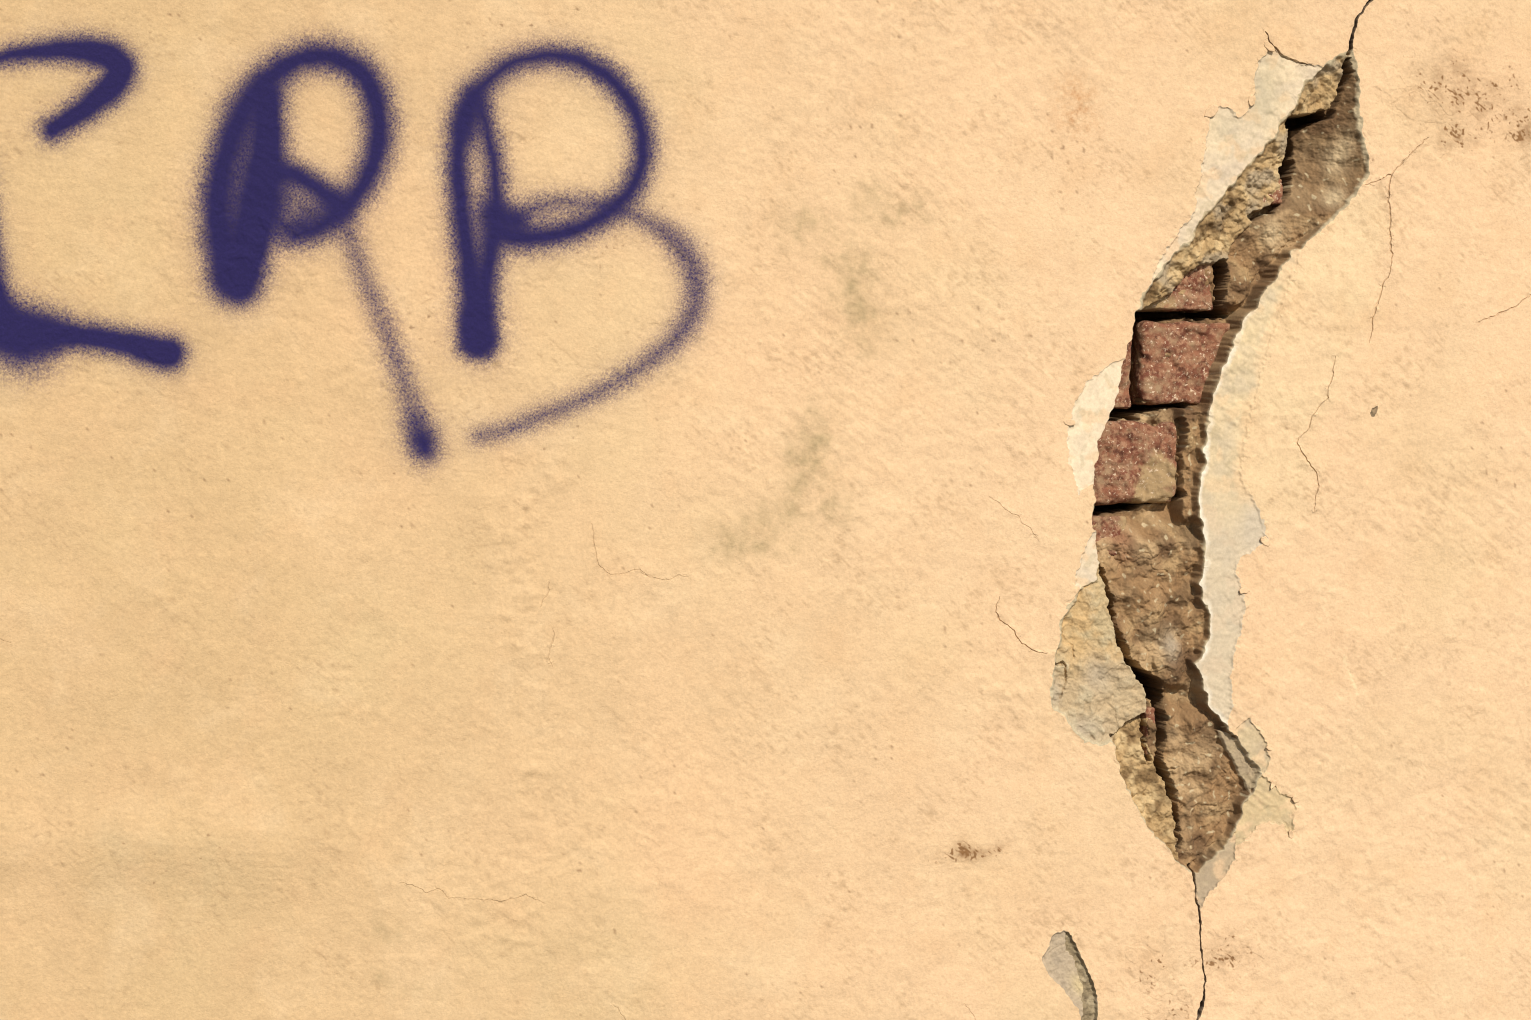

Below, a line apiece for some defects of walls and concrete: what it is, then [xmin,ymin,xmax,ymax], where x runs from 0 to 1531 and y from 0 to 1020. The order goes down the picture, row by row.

crack [1349,0,1373,49]
flaking render [1050,41,1370,910]
flaking render [1042,930,1098,1020]
crack [1196,904,1207,1020]